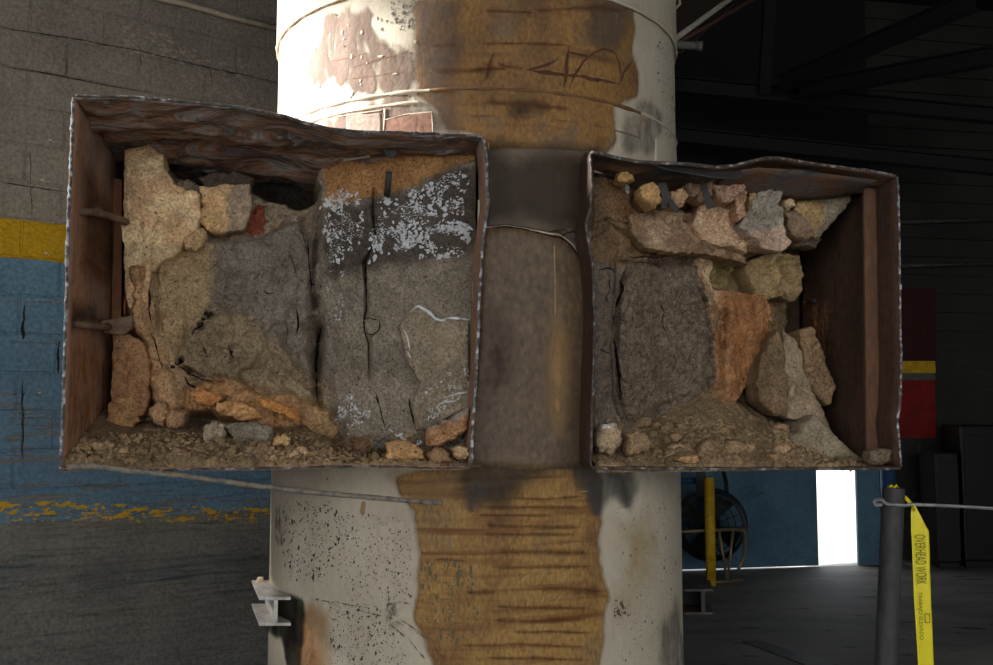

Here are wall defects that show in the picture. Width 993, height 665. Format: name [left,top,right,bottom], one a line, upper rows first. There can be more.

peeling [305,1,431,131]
rust [414,0,638,153]
spalling [203,420,291,446]
crack [363,195,417,430]
water stain [319,171,473,322]
spalling [350,306,469,464]
spalling [593,423,652,456]
crack [600,256,699,399]
spalling [613,172,822,304]
spalling [745,327,836,430]
peeling [0,482,479,665]
rust [397,468,609,665]